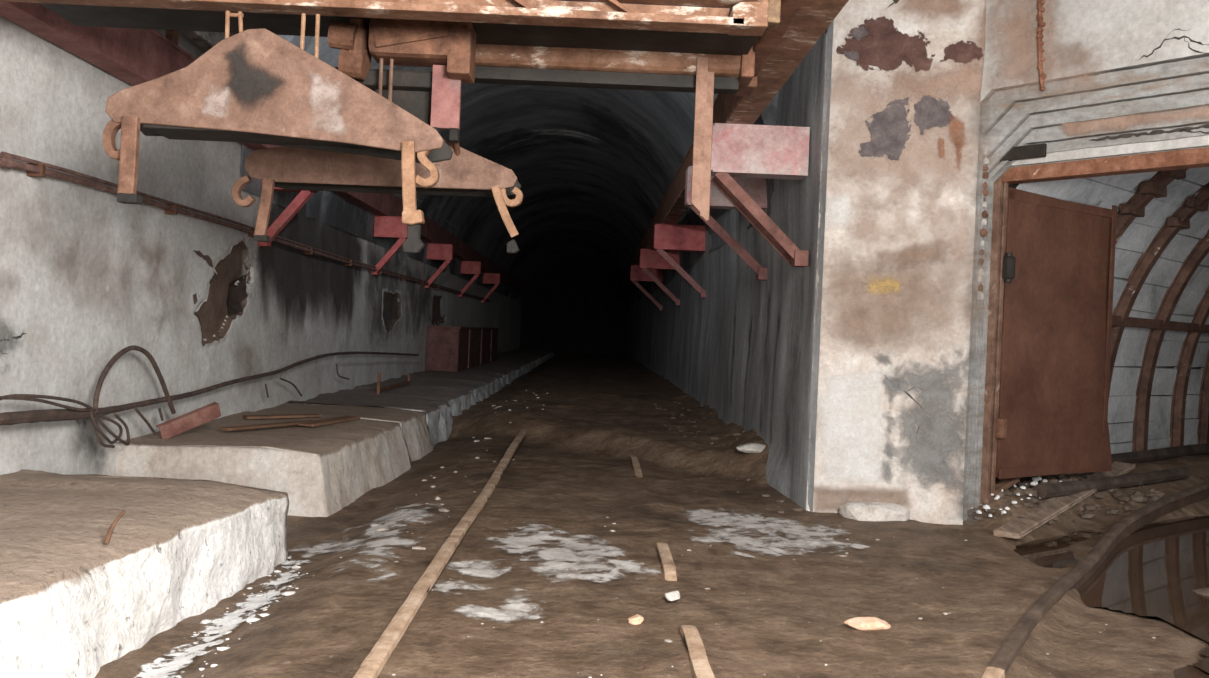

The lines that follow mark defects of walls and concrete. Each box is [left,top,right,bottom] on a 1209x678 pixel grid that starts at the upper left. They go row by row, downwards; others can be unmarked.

leakage [304,36,341,67]
corrosion [1033,0,1053,91]
crack [1139,28,1209,60]
leakage [832,0,1092,225]
spalling [193,237,254,348]
leakage [244,191,429,331]
leakage [831,199,875,238]
peeling [807,16,984,485]
leakage [815,227,978,509]
leakage [687,509,870,558]